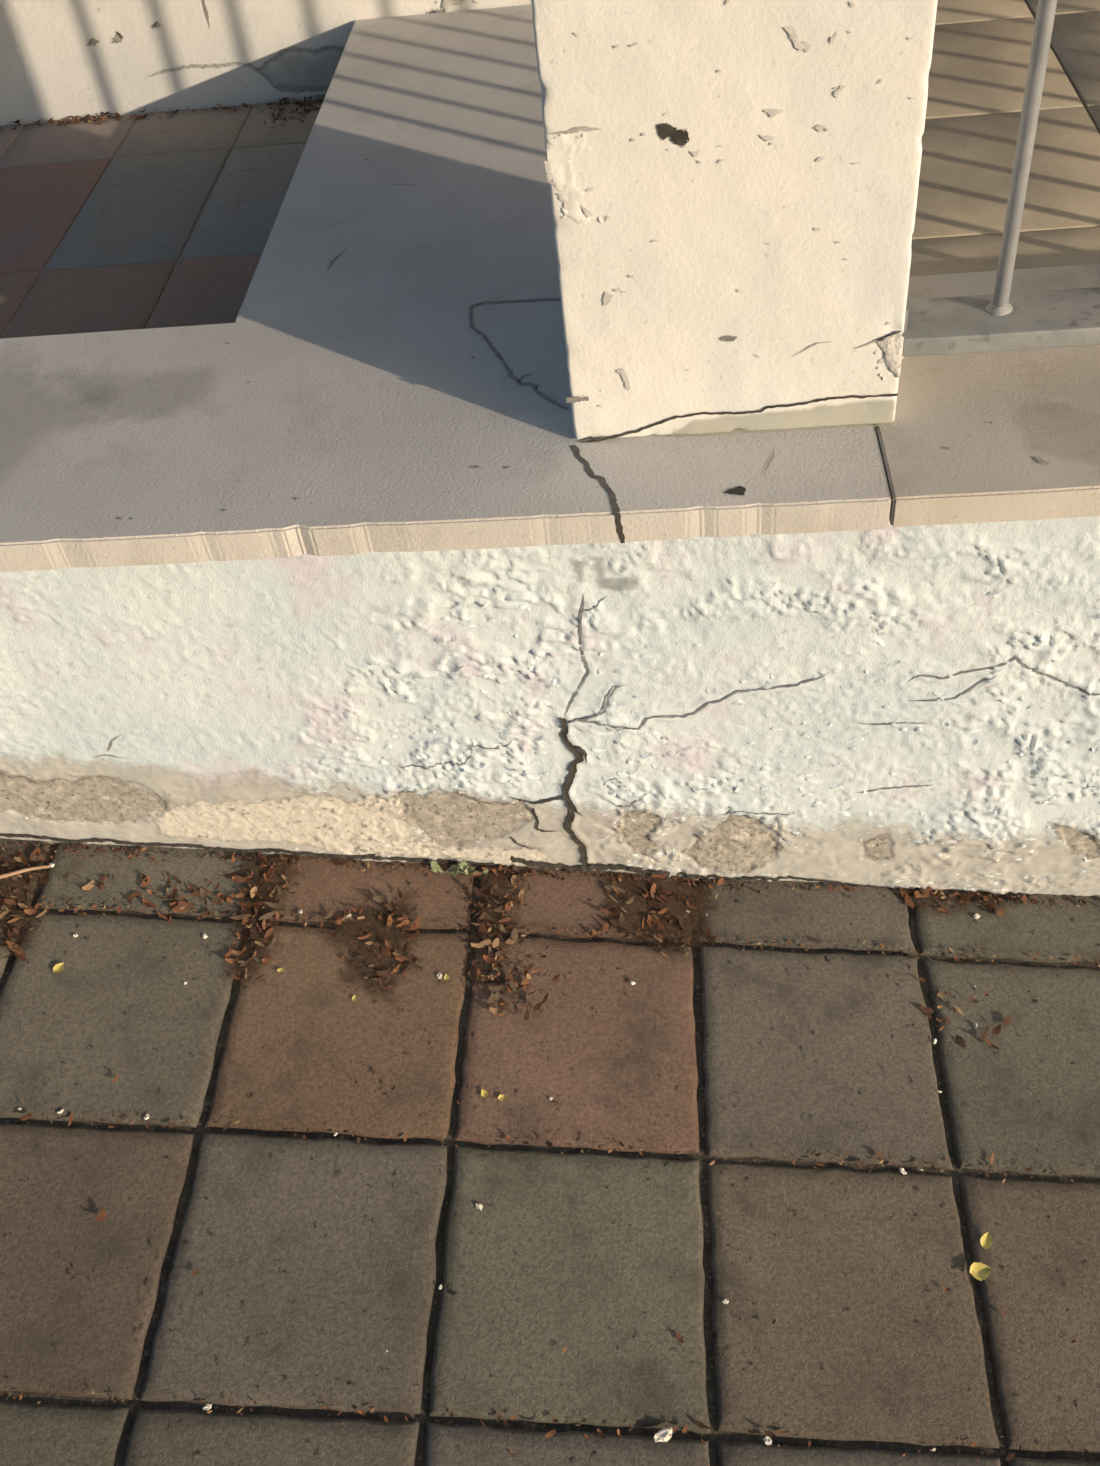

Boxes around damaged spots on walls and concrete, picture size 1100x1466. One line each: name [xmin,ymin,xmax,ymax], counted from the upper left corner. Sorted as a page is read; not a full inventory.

spalling [758,109,784,147]
crack [469,298,568,409]
spalling [566,396,601,407]
crack [796,331,902,355]
crack [570,393,898,543]
peeling [425,601,497,643]
peeling [0,666,556,867]
crack [0,592,1030,896]
spalling [592,695,917,874]
crack [861,657,1100,725]